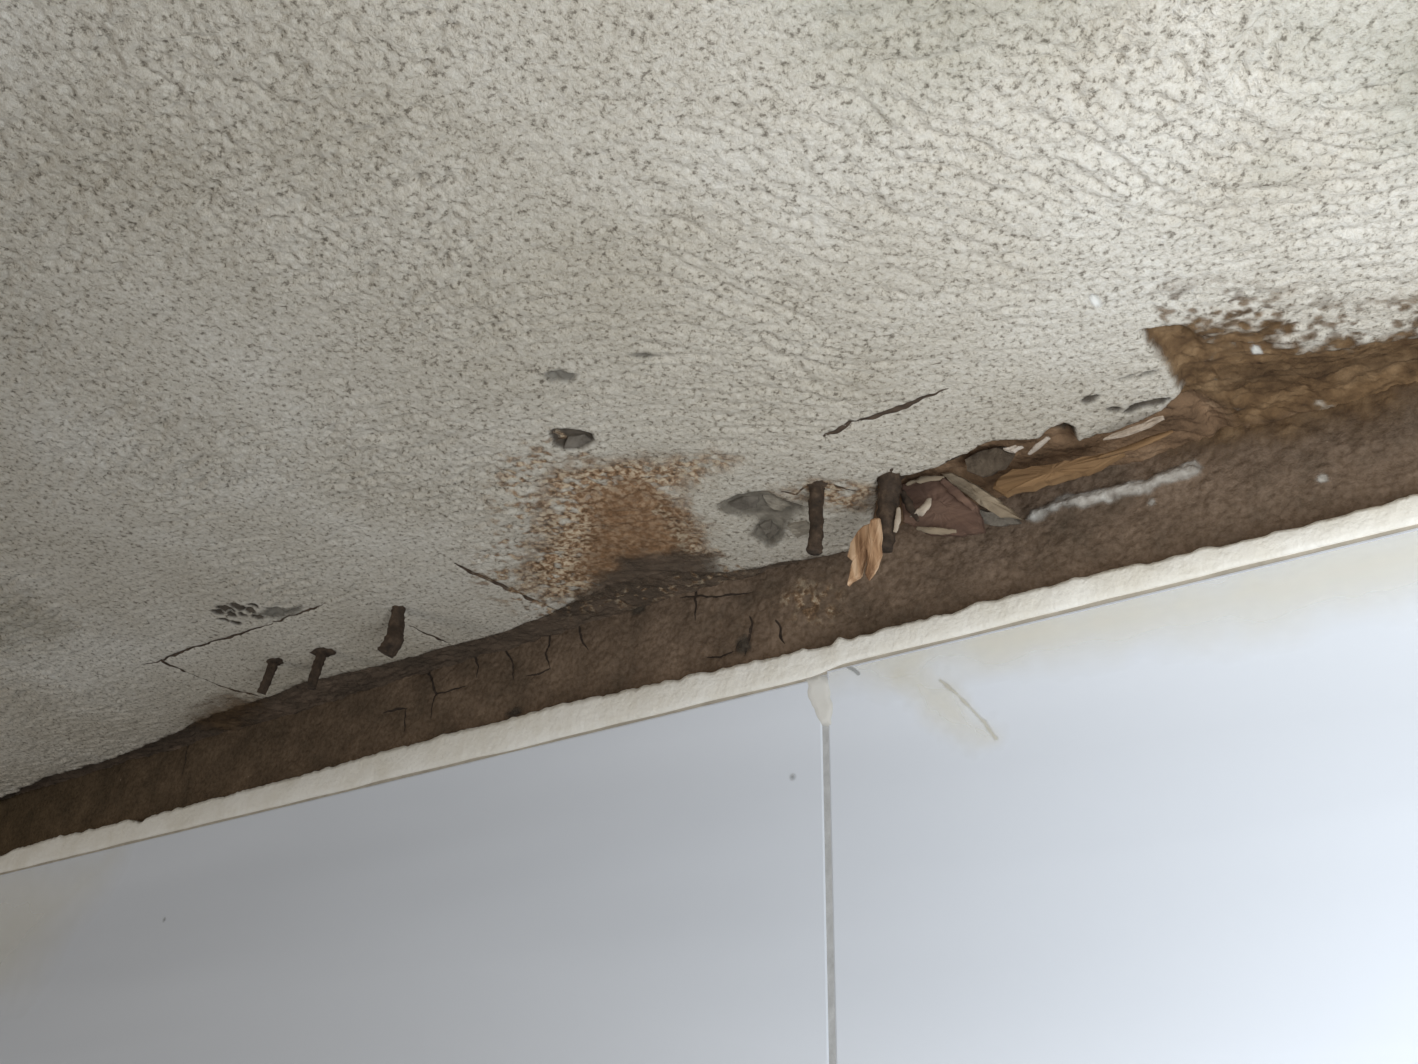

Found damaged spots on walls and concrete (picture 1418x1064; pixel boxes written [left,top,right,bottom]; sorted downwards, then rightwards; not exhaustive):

spalling [550,428,594,449]
crack [823,388,949,437]
spalling [899,390,1314,527]
rust [485,447,741,616]
peeling [719,491,810,546]
rust [794,482,872,508]
spalling [212,603,263,624]
crack [143,603,325,696]